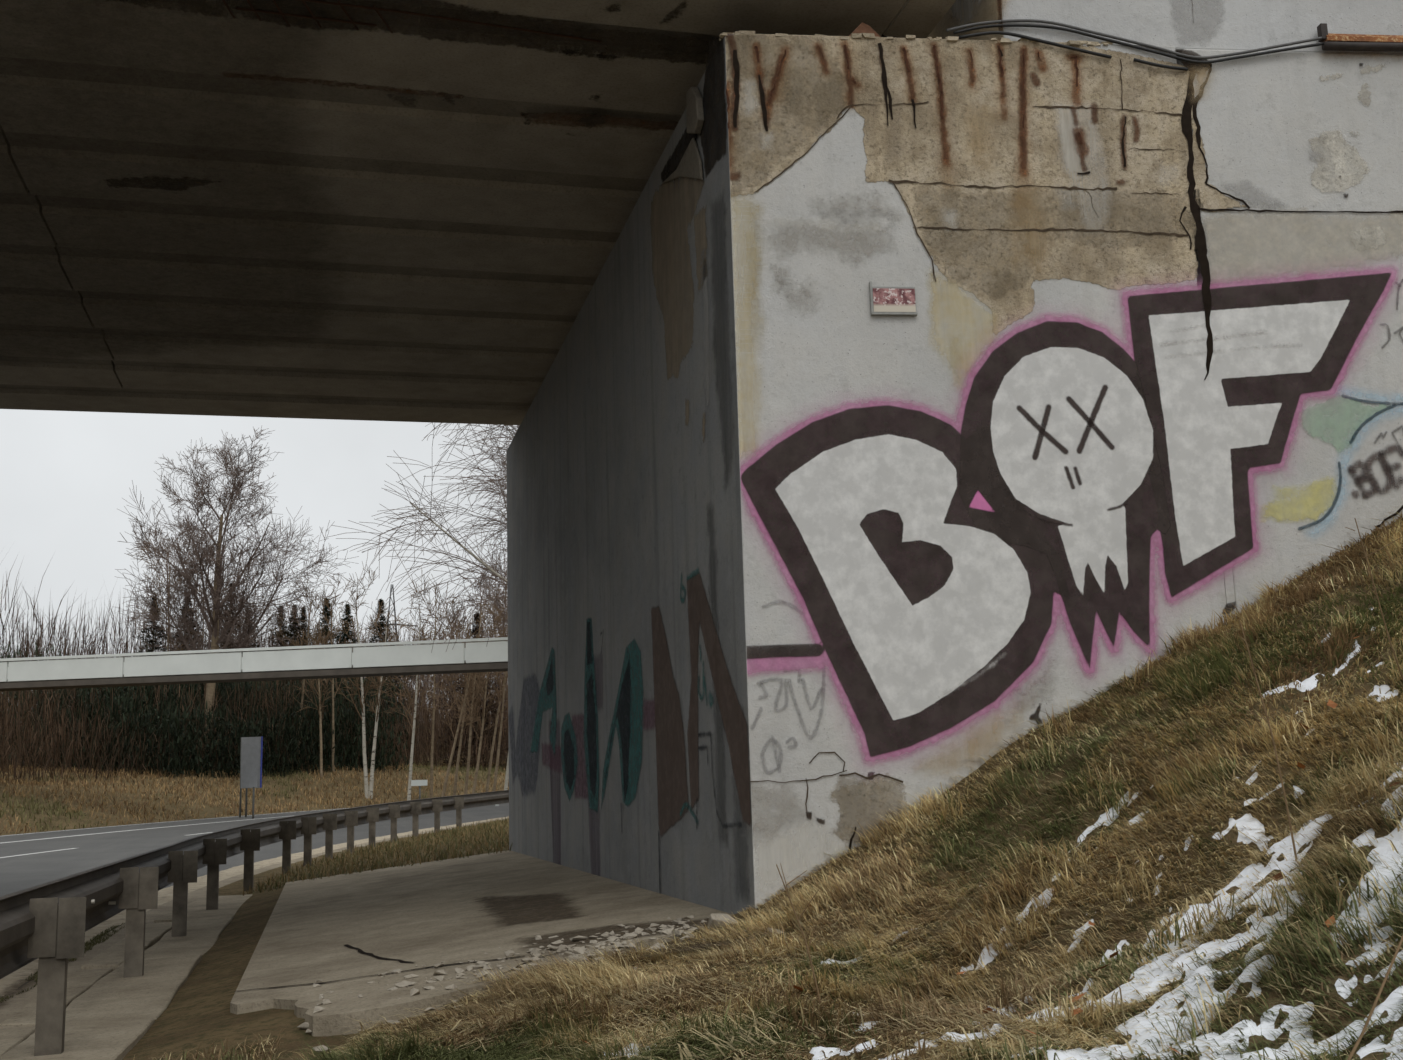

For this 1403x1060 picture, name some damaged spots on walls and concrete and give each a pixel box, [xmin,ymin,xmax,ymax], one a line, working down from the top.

rust [726,33,788,141]
spalling [113,0,1403,380]
rust [843,41,860,105]
rust [878,43,893,126]
rust [901,46,917,128]
rust [932,44,949,165]
rust [968,49,976,85]
rust [997,43,1046,175]
rust [1068,55,1098,175]
rust [1117,115,1140,184]
crack [888,3,1403,380]